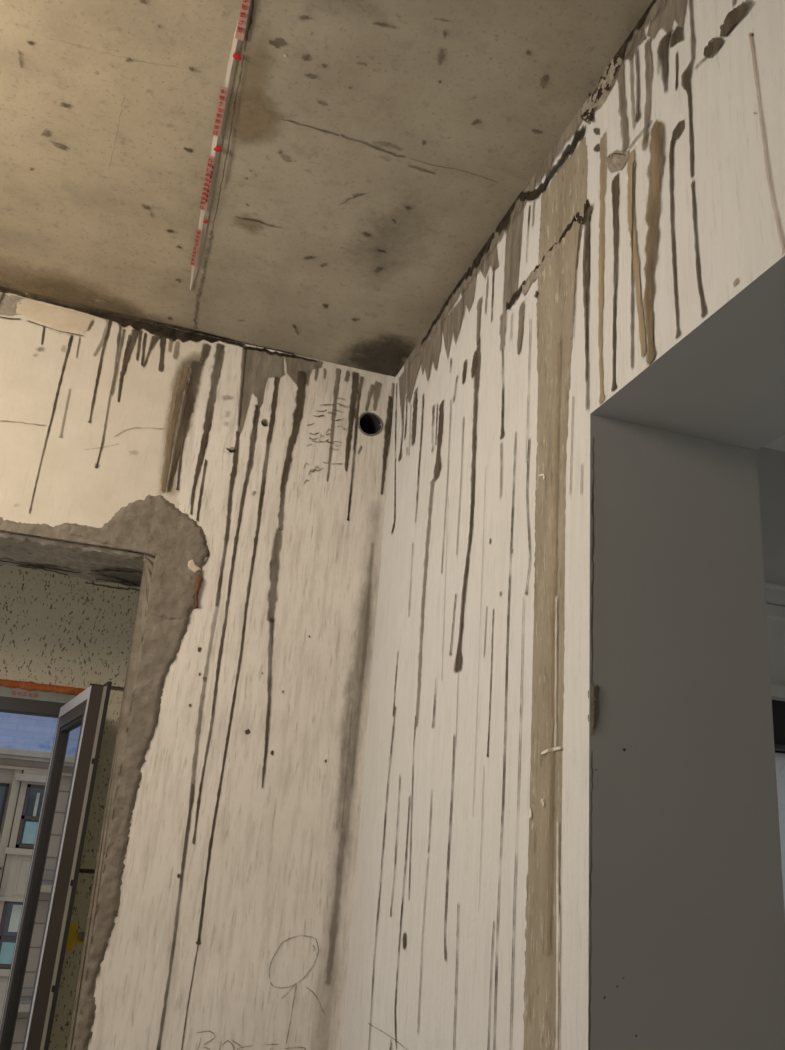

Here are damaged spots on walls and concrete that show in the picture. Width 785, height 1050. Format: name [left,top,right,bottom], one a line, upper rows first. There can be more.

crack [0,0,317,362]
crack [285,120,337,135]
leakage [573,0,706,410]
leakage [0,270,225,521]
peeling [188,559,202,573]
leakage [157,201,534,1050]